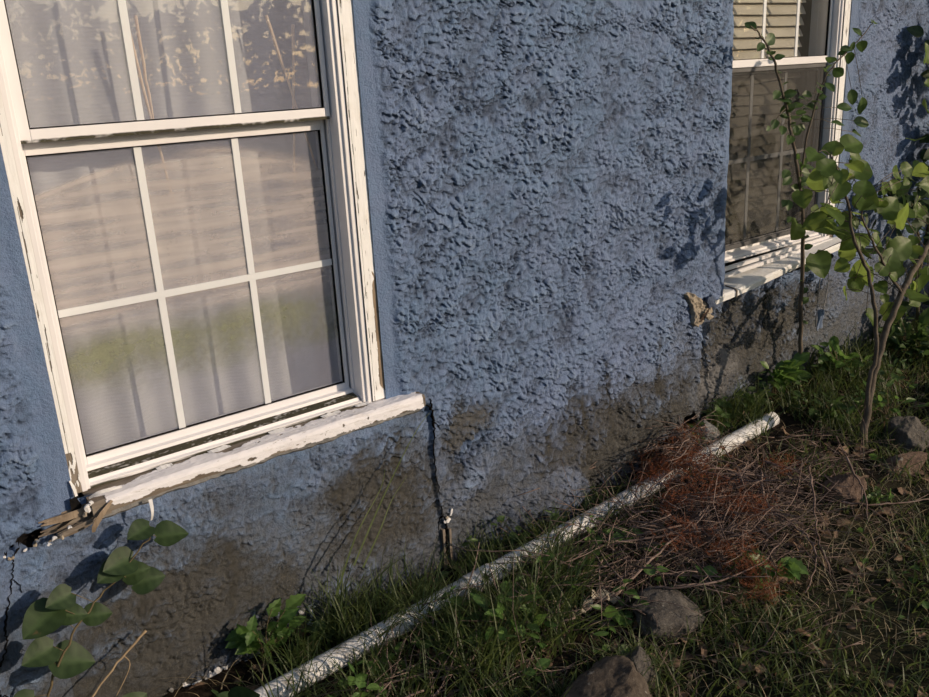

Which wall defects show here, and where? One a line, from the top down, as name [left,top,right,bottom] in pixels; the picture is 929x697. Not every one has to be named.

peeling [0,91,81,491]
peeling [82,0,424,520]
spalling [683,292,717,327]
water stain [328,437,439,562]
crack [426,399,450,567]
water stain [444,405,491,466]
crack [0,536,24,667]